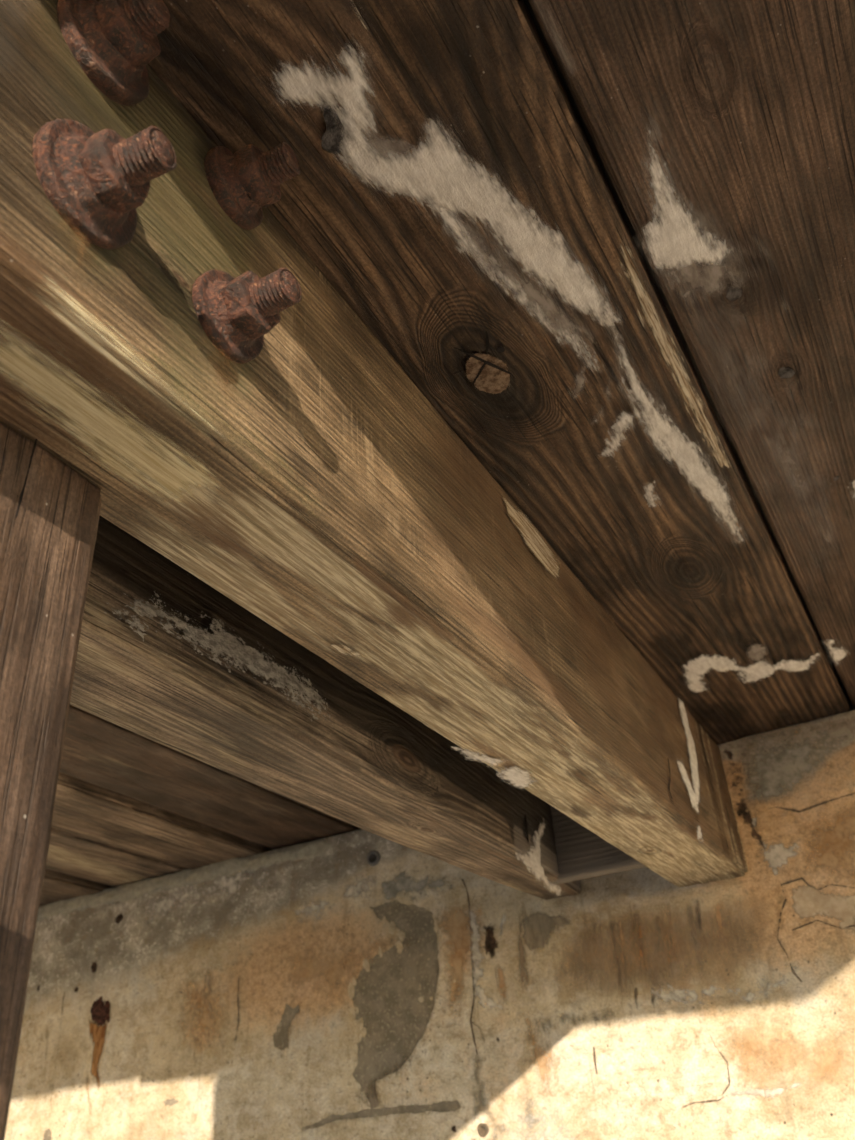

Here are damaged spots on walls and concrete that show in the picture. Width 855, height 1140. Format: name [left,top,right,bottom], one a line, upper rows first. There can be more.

damp [276,50,617,397]
damp [644,151,735,297]
damp [602,338,743,541]
damp [332,644,360,656]
damp [683,640,847,693]
damp [677,698,702,840]
crack [768,793,855,813]
damp [516,819,561,895]
crack [777,877,855,982]
corrosion [87,996,110,1096]
peeling [302,900,461,1131]